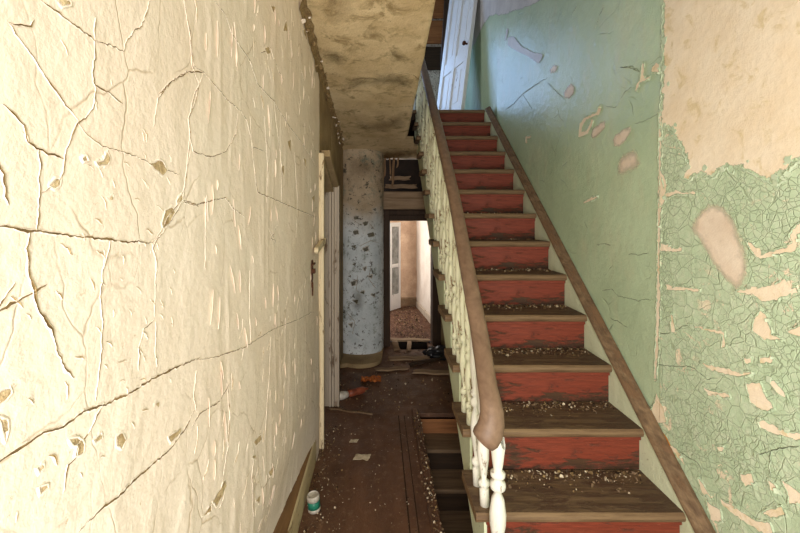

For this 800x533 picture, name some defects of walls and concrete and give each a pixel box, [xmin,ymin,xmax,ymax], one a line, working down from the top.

flaking render [144,153,172,185]
peeling [635,0,800,382]
flaking render [159,193,184,230]
crack [0,0,317,533]
crack [659,364,714,380]
peeling [698,353,800,443]
flaking render [34,454,58,498]
flaking render [67,430,104,459]
flaking render [115,430,127,451]
peeling [670,446,687,467]
crack [754,446,799,479]
peeling [697,470,800,533]